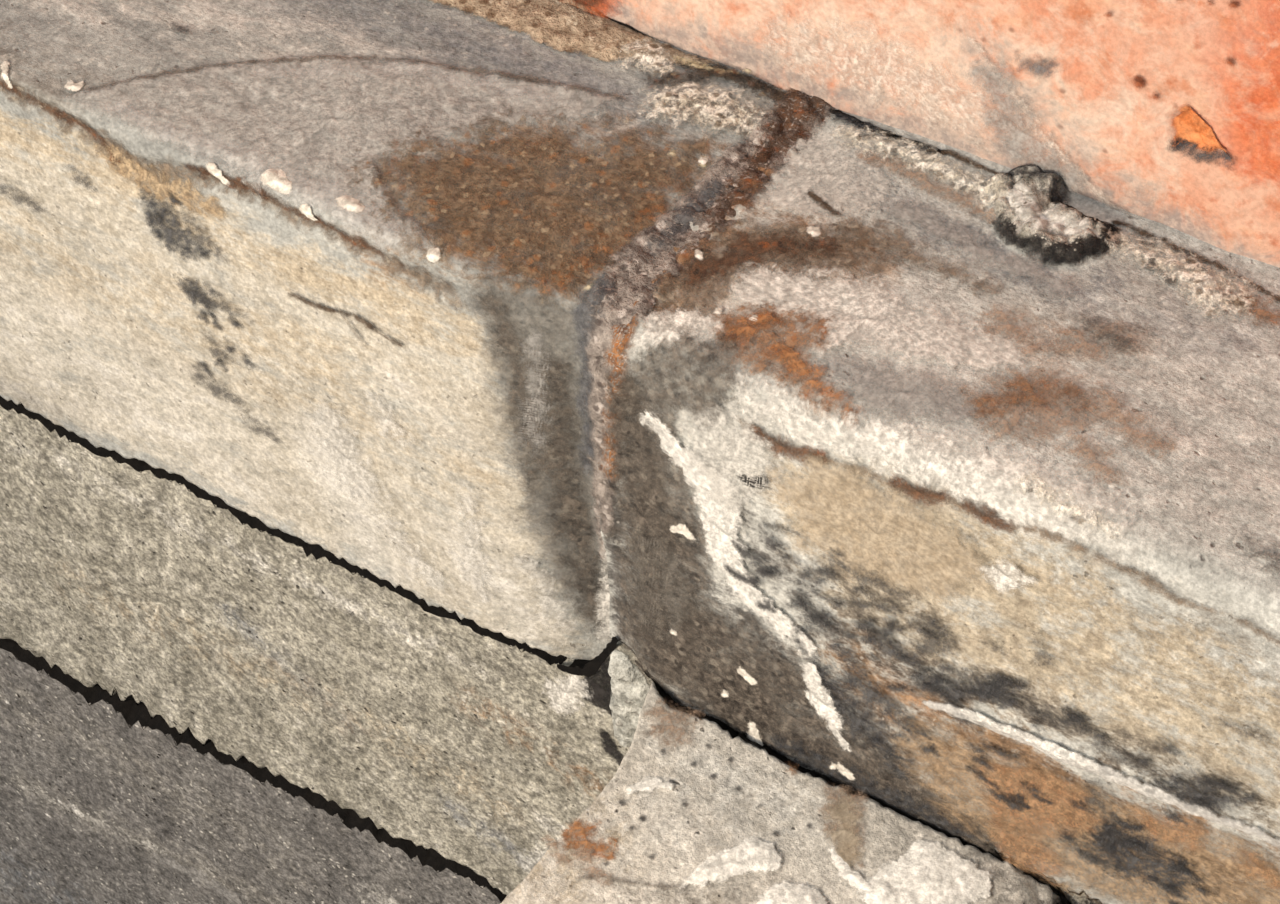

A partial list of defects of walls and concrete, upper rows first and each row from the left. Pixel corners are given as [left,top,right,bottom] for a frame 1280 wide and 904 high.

corrosion [351,114,713,306]
damp [315,403,378,501]
damp [366,392,403,445]
corrosion [601,301,638,478]
corrosion [717,304,863,423]
damp [381,519,442,588]
damp [459,490,489,602]
damp [473,288,1202,894]